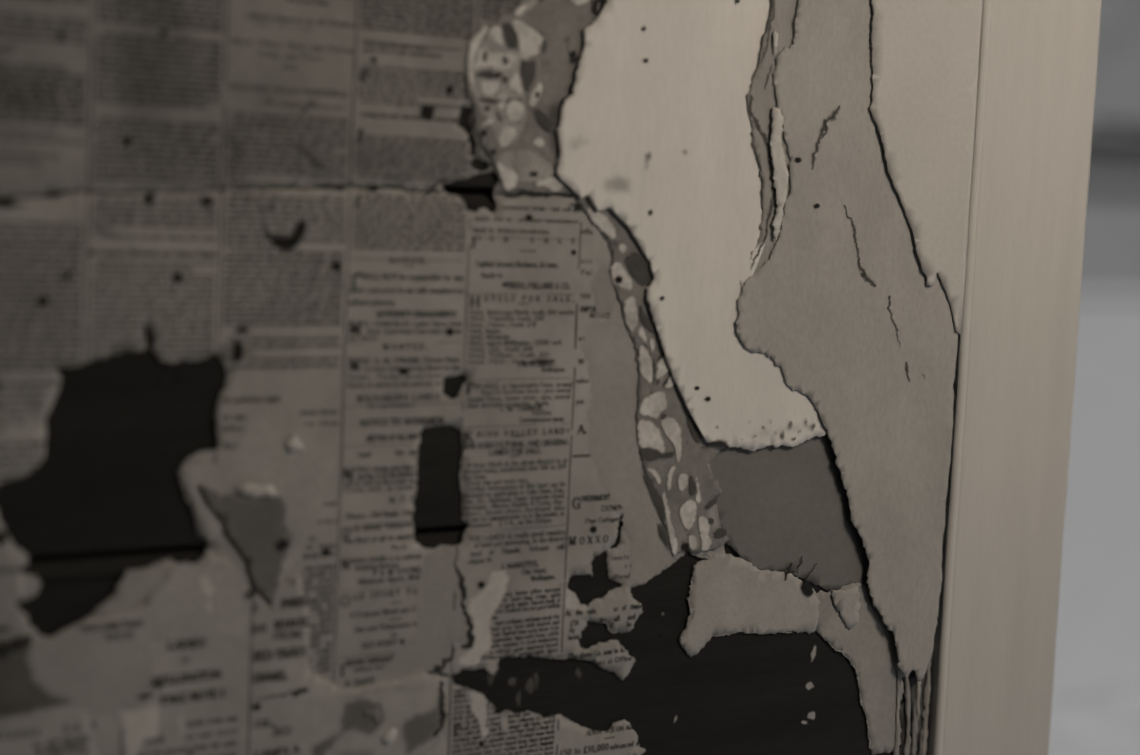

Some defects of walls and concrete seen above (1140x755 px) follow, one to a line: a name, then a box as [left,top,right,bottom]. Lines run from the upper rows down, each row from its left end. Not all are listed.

crack [316,180,446,195]
peeling [441,106,501,213]
crack [749,0,797,270]
peeling [769,107,789,240]
crack [812,106,840,170]
crack [844,205,925,382]
peeling [0,324,339,717]
peeling [411,425,468,551]
peeling [451,518,904,755]